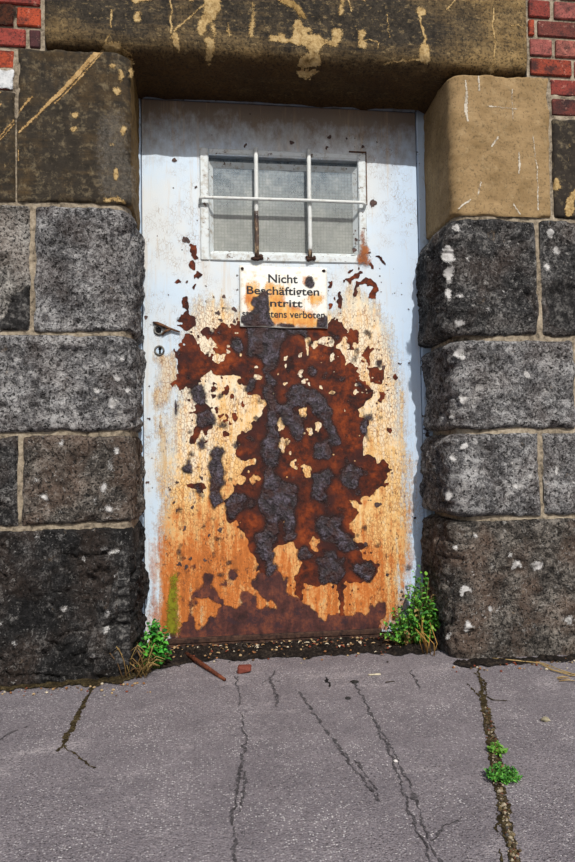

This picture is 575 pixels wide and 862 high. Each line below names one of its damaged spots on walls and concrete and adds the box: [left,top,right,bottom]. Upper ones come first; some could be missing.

corrosion [357,231,371,265]
corrosion [152,276,412,638]
peeling [168,236,410,616]
crack [56,686,96,768]
corrosion [185,652,226,681]
crack [229,677,248,862]
crack [261,670,380,801]
crack [354,683,461,862]
crack [467,668,522,862]